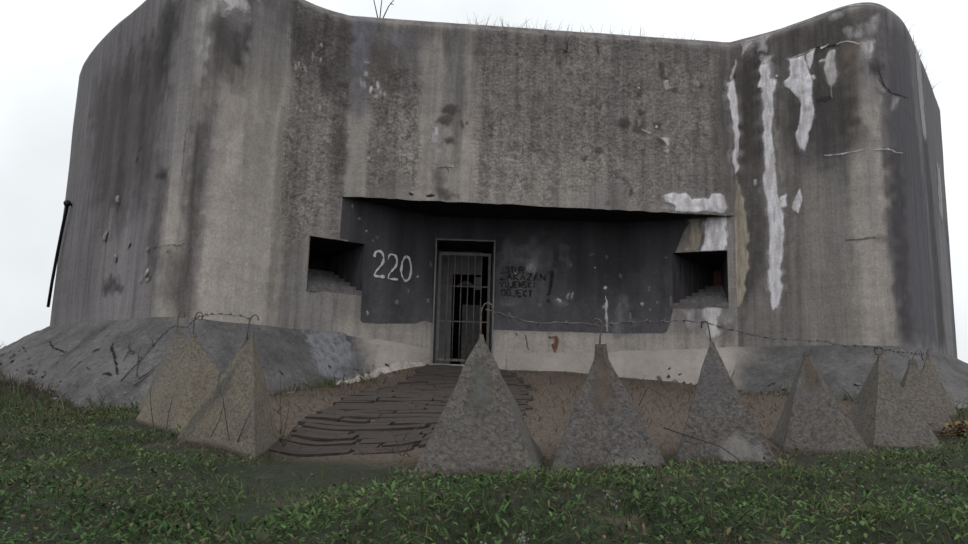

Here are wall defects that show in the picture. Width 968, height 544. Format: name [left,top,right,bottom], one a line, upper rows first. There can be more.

water stain [194,0,259,85]
crack [788,41,860,59]
crack [825,148,902,156]